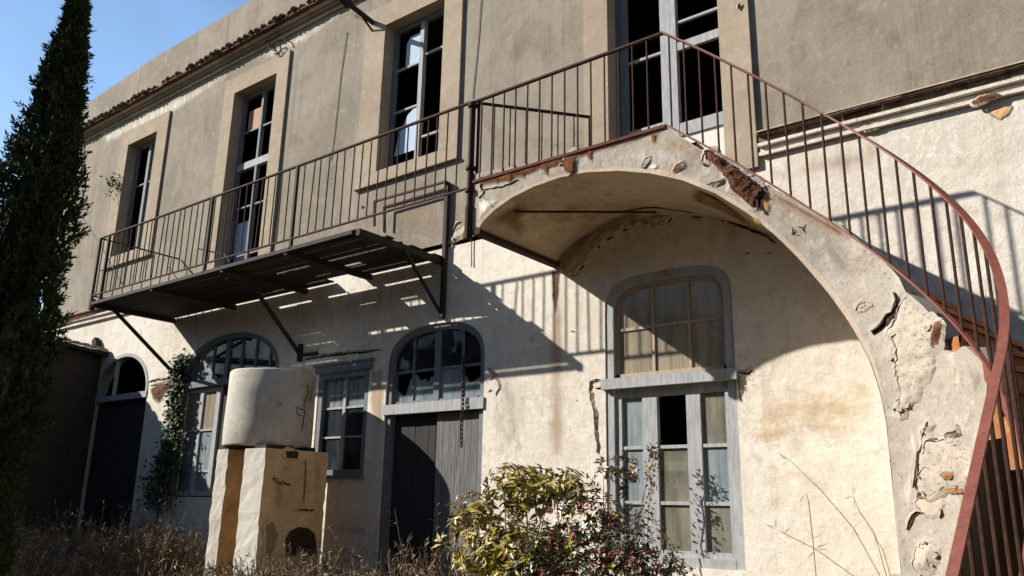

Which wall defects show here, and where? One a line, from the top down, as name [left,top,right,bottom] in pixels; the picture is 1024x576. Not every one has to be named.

flaking render [969,93,1014,121]
corrosion [480,149,591,184]
flaking render [640,155,656,169]
flaking render [671,160,686,174]
flaking render [702,146,769,213]
crack [589,379,601,453]
flaking render [870,292,973,503]
flaking render [910,535,942,576]